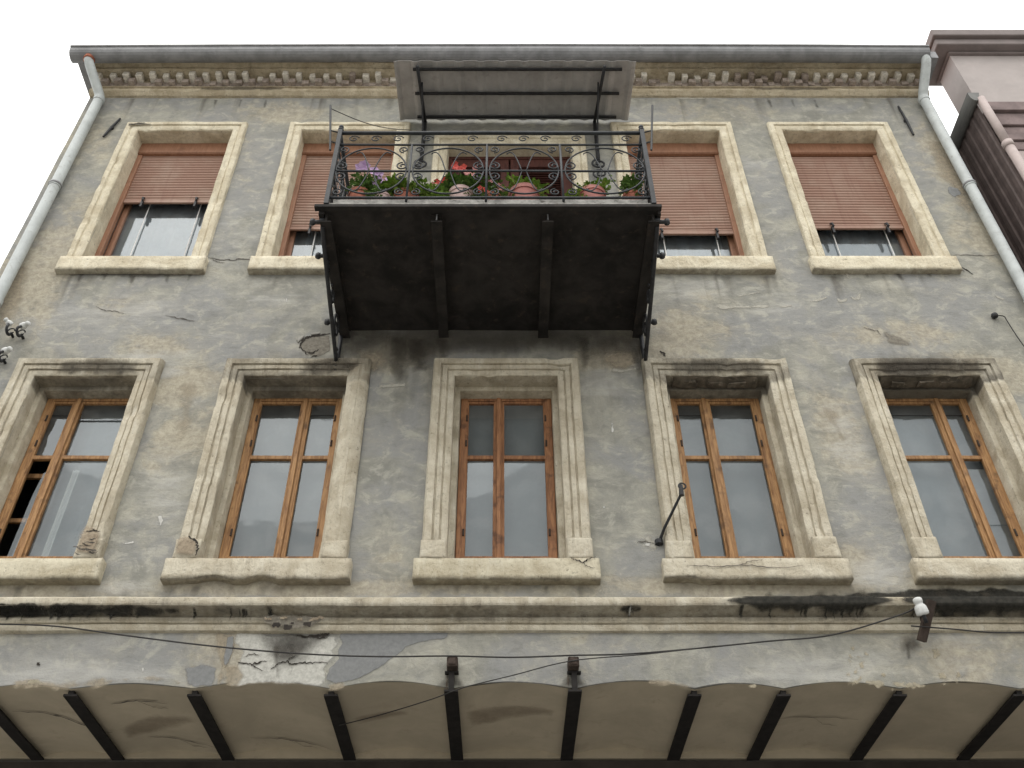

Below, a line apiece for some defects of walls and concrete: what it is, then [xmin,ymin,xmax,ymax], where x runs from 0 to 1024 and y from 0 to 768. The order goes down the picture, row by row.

spalling [73,527,99,555]
spalling [176,536,199,556]
leakage [0,603,178,620]
leakage [728,588,1024,619]
flaking render [217,616,344,689]
crack [238,633,330,671]